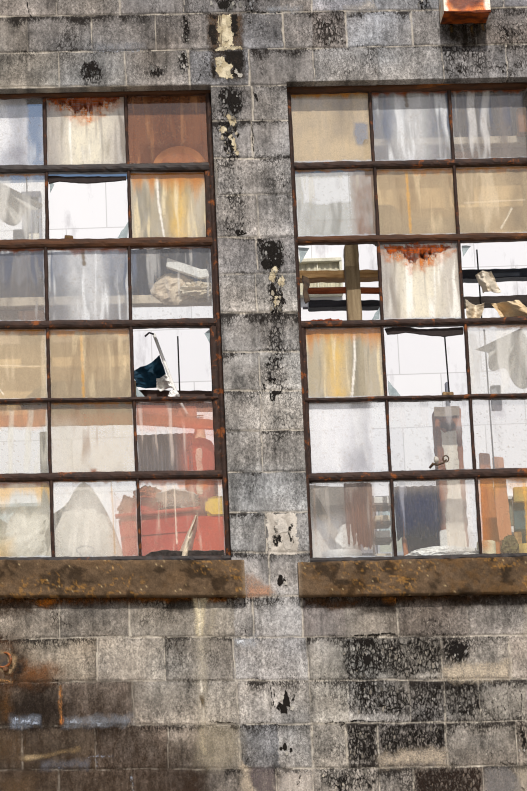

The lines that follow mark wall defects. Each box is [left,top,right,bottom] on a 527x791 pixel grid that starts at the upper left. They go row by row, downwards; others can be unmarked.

peeling [208,0,257,236]
peeling [257,239,291,404]
peeling [264,512,299,555]
rust [0,641,47,685]
water stain [194,598,213,636]
water stain [0,684,202,791]